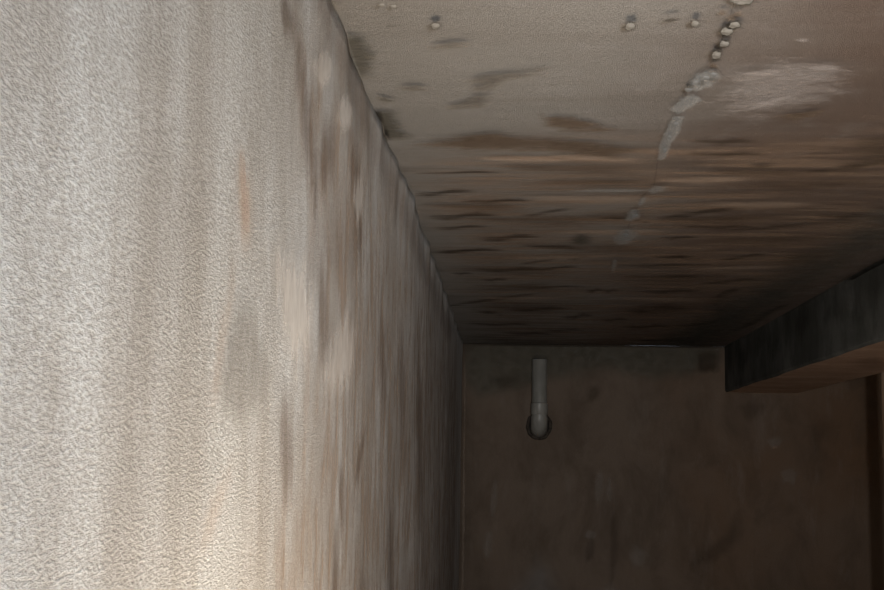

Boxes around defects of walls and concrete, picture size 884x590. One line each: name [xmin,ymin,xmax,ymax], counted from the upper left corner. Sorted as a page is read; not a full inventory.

leakage [429,72,884,369]